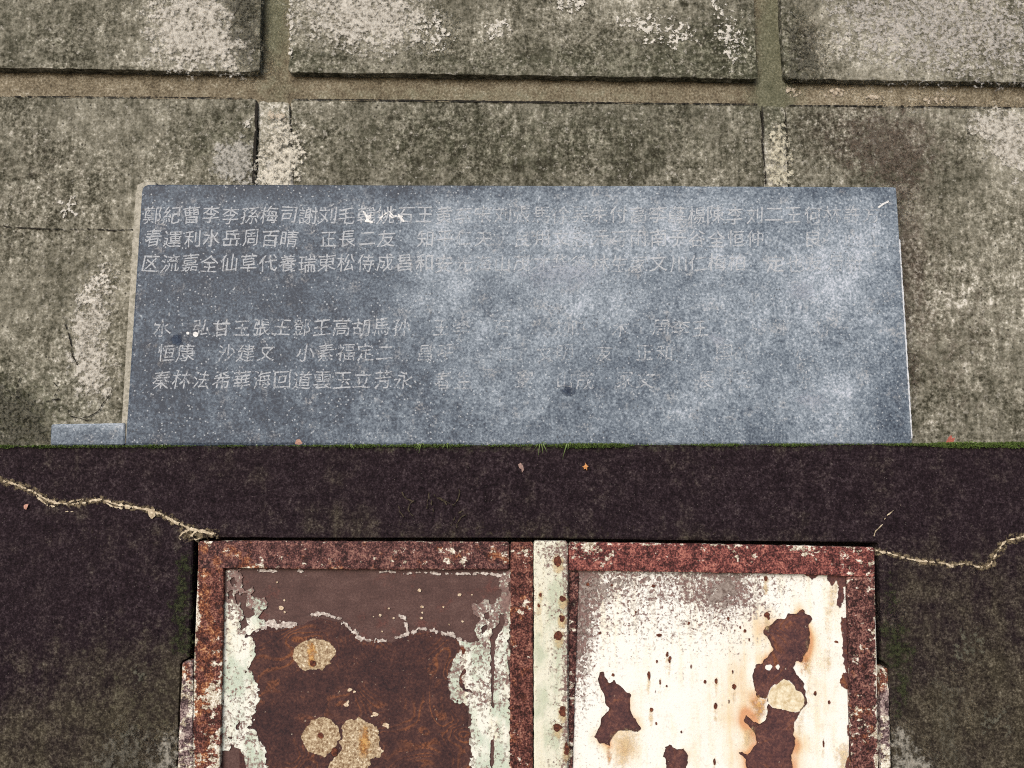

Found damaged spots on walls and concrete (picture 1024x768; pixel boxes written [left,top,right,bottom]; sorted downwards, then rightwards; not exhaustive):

crack [0,476,218,541]
crack [873,510,1024,570]
peeling [222,568,268,768]
corrosion [245,618,471,768]
peeling [447,569,511,768]
corrosion [594,672,657,763]
peeling [576,571,745,671]
corrosion [663,745,688,768]
corrosion [739,609,831,768]